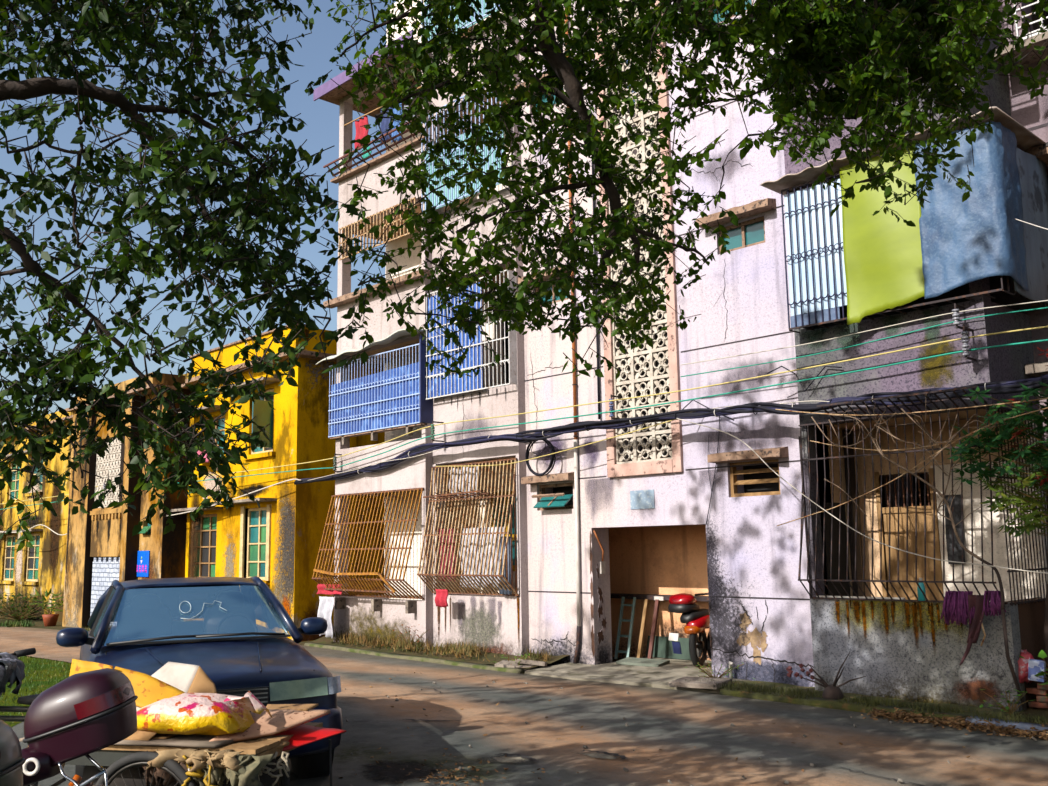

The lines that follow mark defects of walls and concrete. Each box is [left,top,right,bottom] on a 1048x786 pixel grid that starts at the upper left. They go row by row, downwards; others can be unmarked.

leakage [663,520,813,686]
peeling [736,610,768,666]
rust [835,601,947,646]